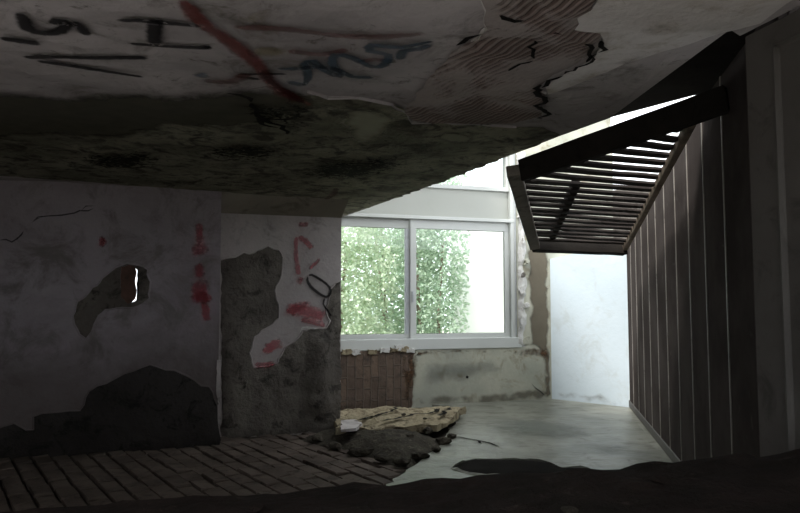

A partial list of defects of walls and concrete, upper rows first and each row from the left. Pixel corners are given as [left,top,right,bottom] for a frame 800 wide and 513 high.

peeling [0,0,792,215]
crack [2,206,92,243]
spalling [0,246,418,460]
spalling [517,213,530,347]